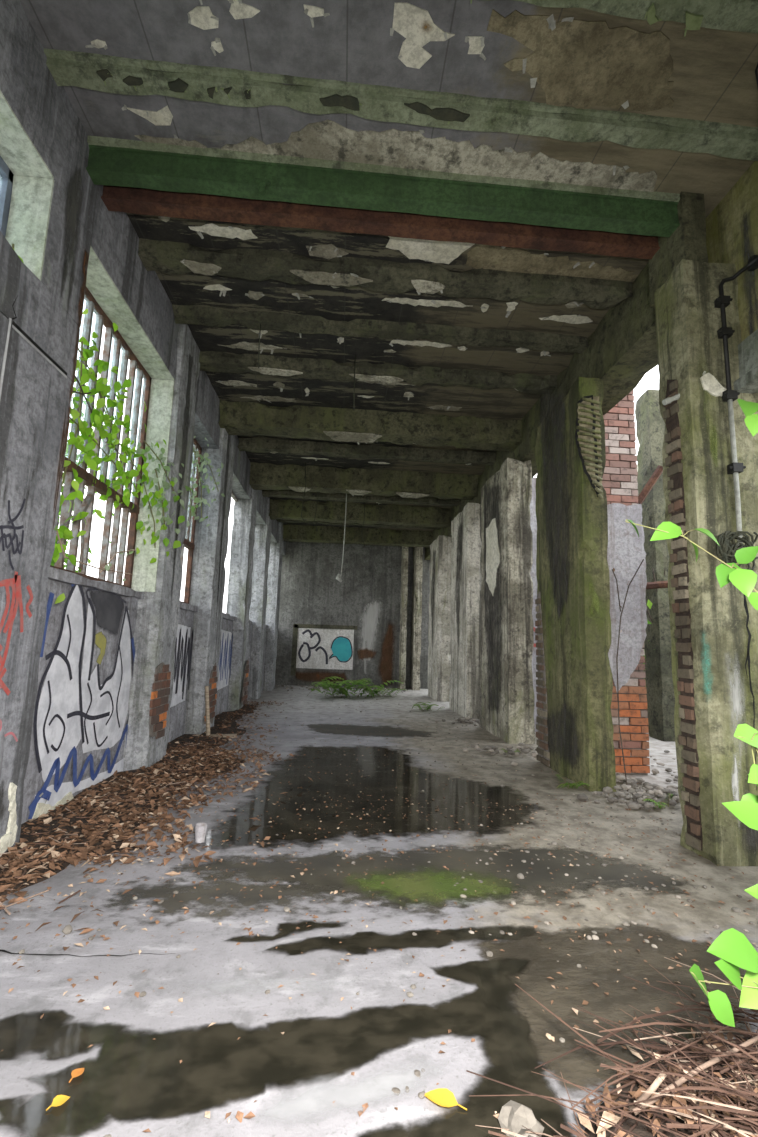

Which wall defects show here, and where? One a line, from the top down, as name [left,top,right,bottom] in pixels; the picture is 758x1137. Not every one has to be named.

peeling [187,0,260,56]
peeling [188,223,257,240]
peeling [180,259,232,297]
peeling [290,244,373,299]
peeling [382,280,466,308]
peeling [386,236,638,282]
peeling [383,339,468,353]
peeling [216,367,310,403]
water stain [540,393,569,618]
water stain [547,705,579,768]
peeling [0,783,18,857]
water stain [742,822,758,850]